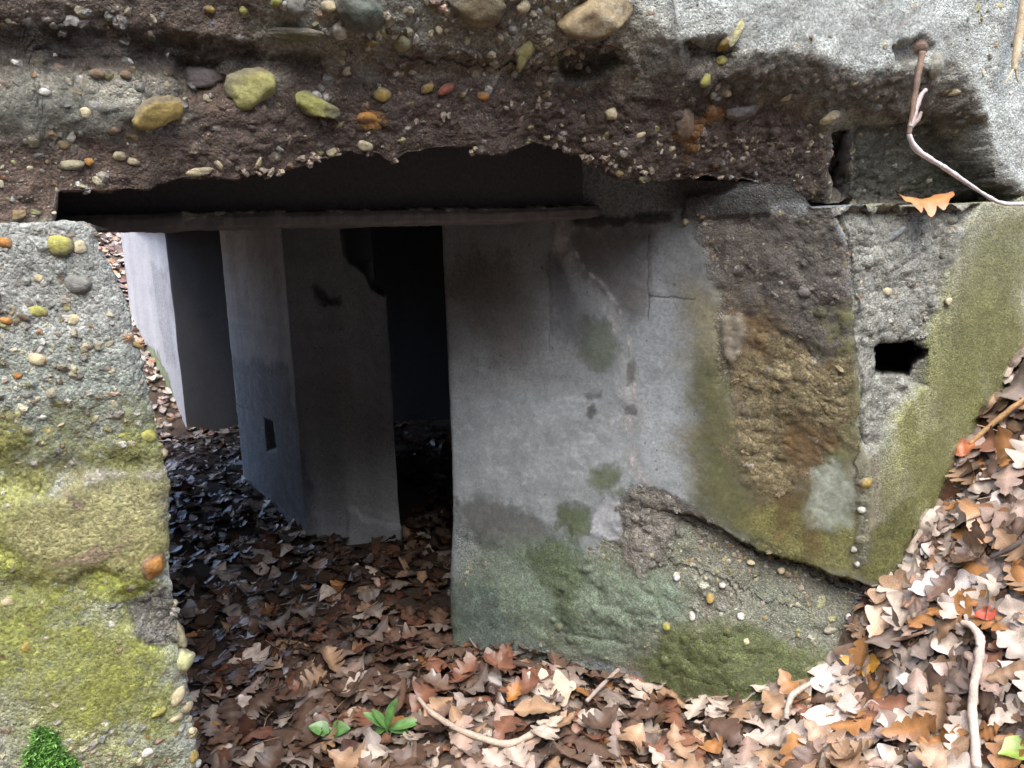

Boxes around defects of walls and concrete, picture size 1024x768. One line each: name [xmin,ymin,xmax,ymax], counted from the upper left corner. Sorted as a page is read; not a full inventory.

spalling [147,46,1011,503]
water stain [83,469,125,486]
spalling [590,484,720,579]
crack [686,521,863,592]